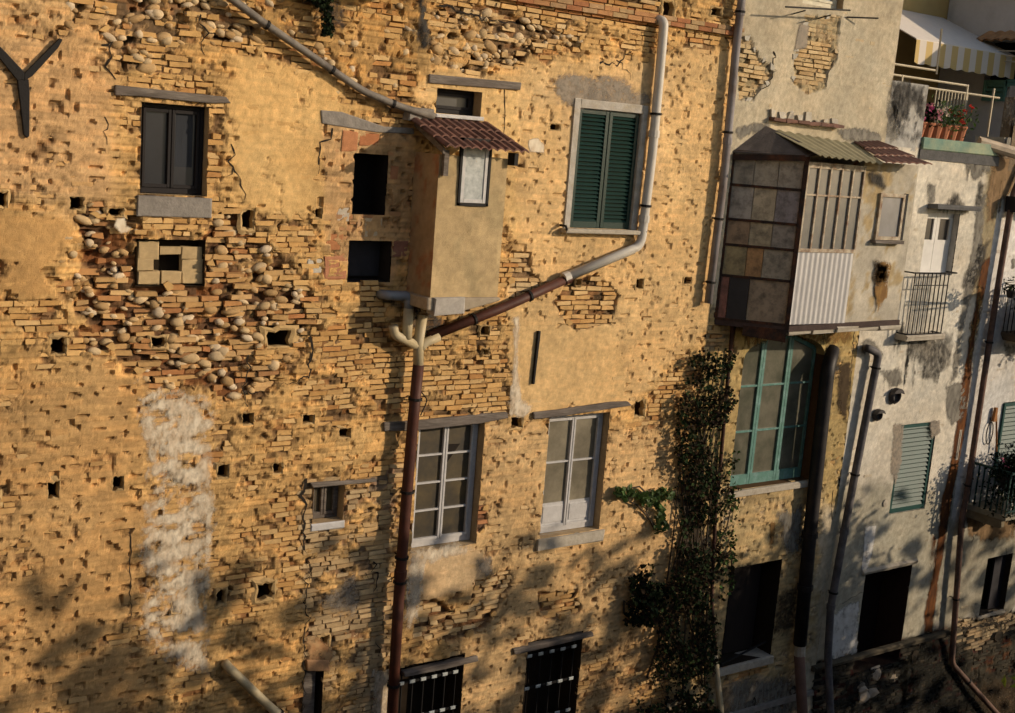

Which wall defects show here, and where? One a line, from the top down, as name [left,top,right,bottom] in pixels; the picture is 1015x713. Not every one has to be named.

flaking render [738,35,775,101]
flaking render [791,13,842,94]
damp [868,172,886,189]
spalling [553,272,620,328]
damp [873,261,891,311]
damp [884,155,1015,438]
damp [798,332,883,355]
rust [924,258,990,633]
efflorescence [140,389,213,670]
crack [298,478,312,711]